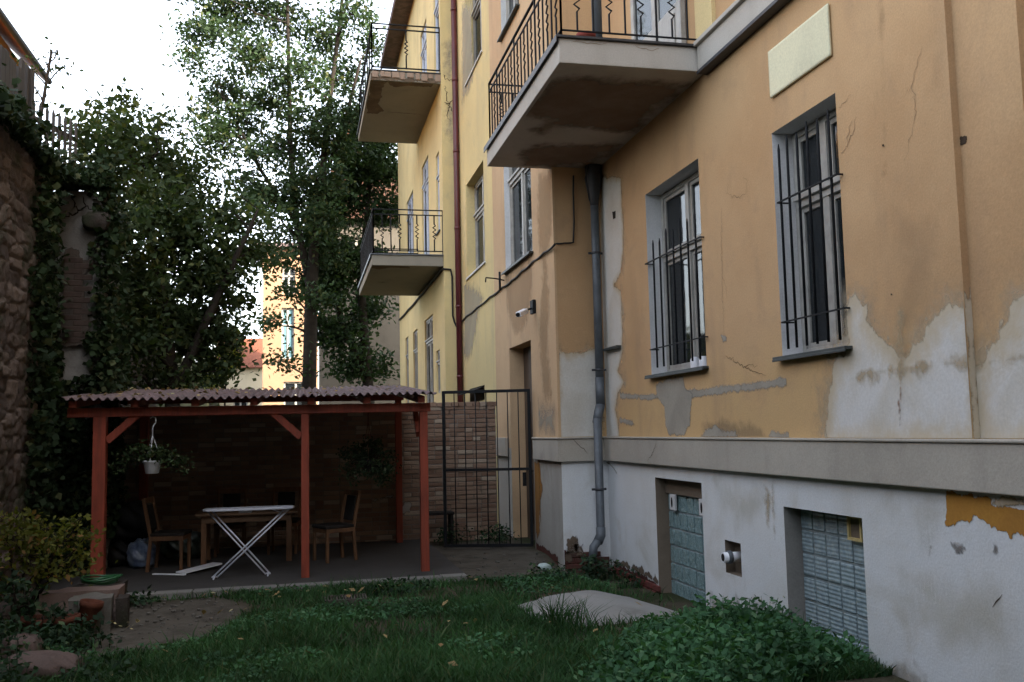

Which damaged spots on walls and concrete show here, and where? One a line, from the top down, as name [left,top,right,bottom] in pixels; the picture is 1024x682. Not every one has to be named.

peeling [559,176,625,437]
peeling [821,288,1024,438]
flaking render [536,536,661,593]
peeling [945,491,1024,539]